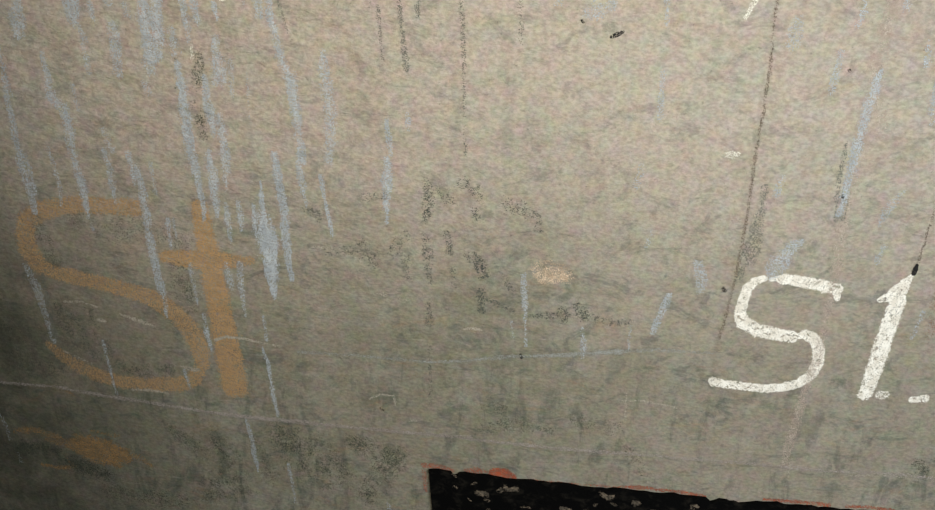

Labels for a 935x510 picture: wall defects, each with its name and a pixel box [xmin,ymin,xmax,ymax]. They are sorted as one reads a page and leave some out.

water stain [0,44,212,394]
water stain [61,0,295,300]
water stain [242,0,338,237]
water stain [397,0,420,72]
water stain [421,176,483,224]
crack [719,0,779,340]
peeling [468,482,519,510]